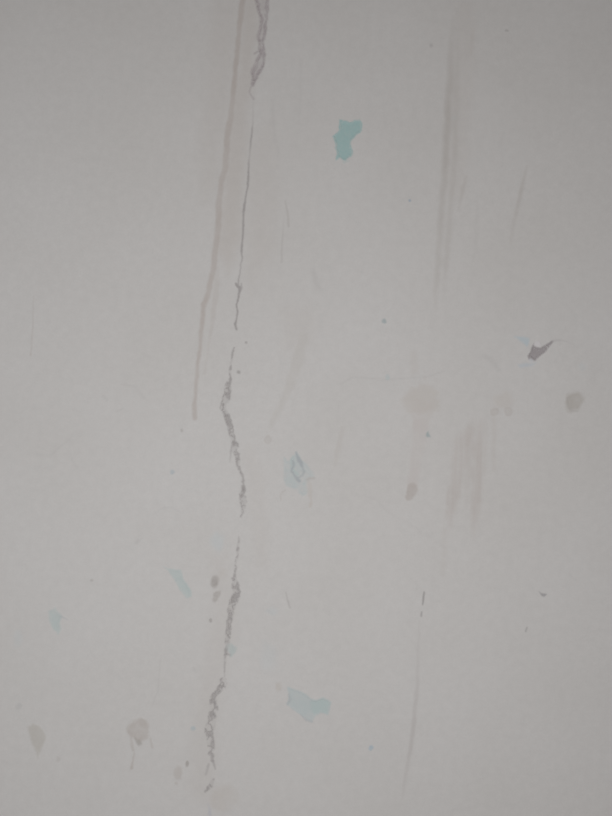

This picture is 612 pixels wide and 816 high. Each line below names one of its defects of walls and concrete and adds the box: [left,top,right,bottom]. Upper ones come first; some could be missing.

water stain [191,0,247,421]
crack [203,0,270,816]
peeling [332,119,363,165]